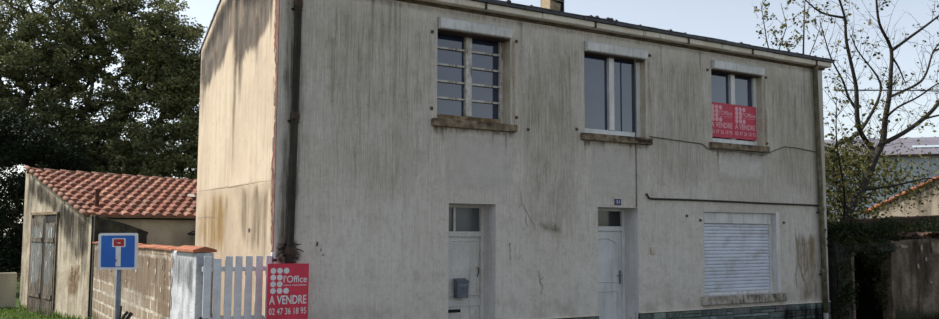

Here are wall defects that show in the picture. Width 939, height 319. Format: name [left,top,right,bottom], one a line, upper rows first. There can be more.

damp [201,0,272,85]
damp [29,181,192,319]